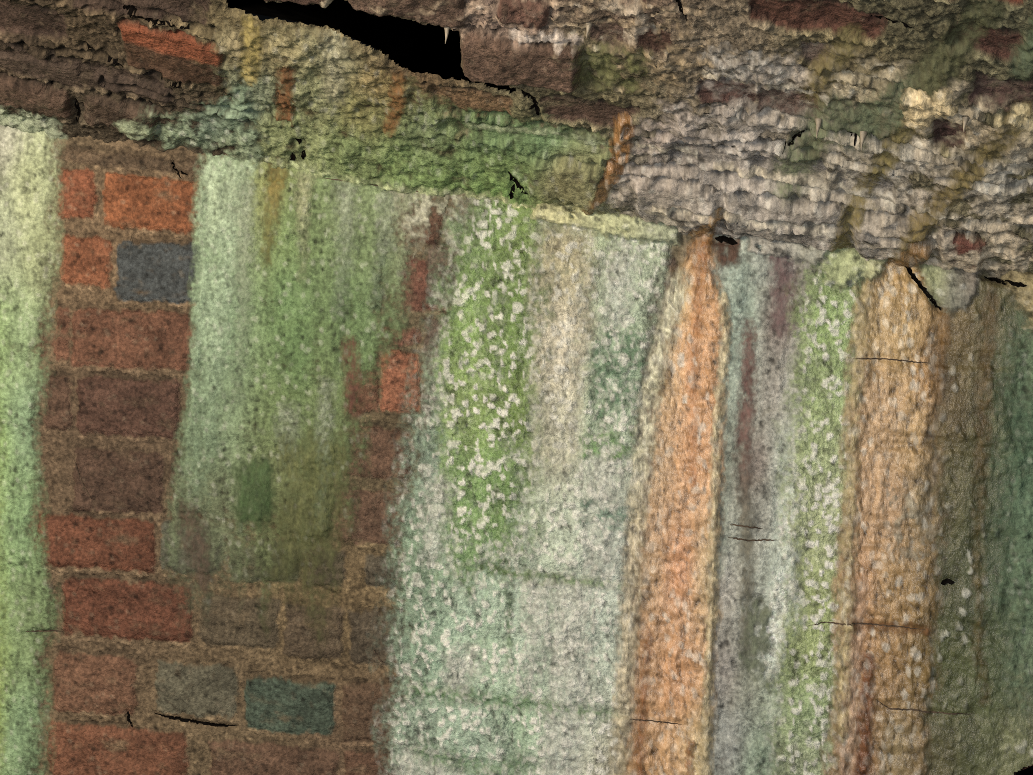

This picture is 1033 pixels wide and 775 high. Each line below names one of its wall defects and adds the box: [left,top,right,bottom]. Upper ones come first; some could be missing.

peeling [700,46,828,100]
peeling [900,87,958,130]
peeling [995,104,1033,129]
damp [467,123,607,146]
peeling [826,131,911,162]
peeling [717,163,872,198]
spalling [715,235,737,245]
peeling [652,207,835,239]
crack [906,267,941,311]
damp [165,153,670,775]